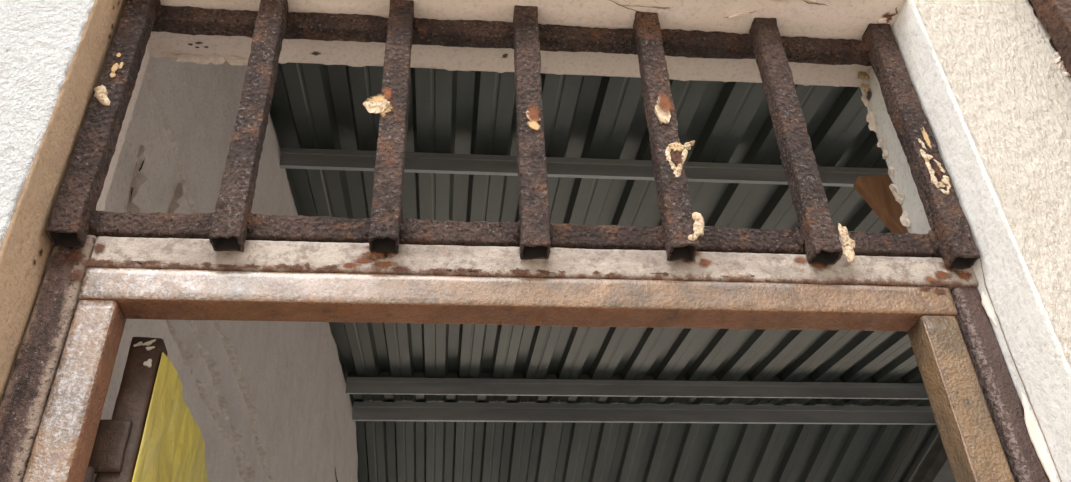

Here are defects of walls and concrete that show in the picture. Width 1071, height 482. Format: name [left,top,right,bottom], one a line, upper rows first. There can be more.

crack [878,7,898,24]
rust [66,243,113,281]
rust [202,246,409,272]
rust [919,262,972,294]